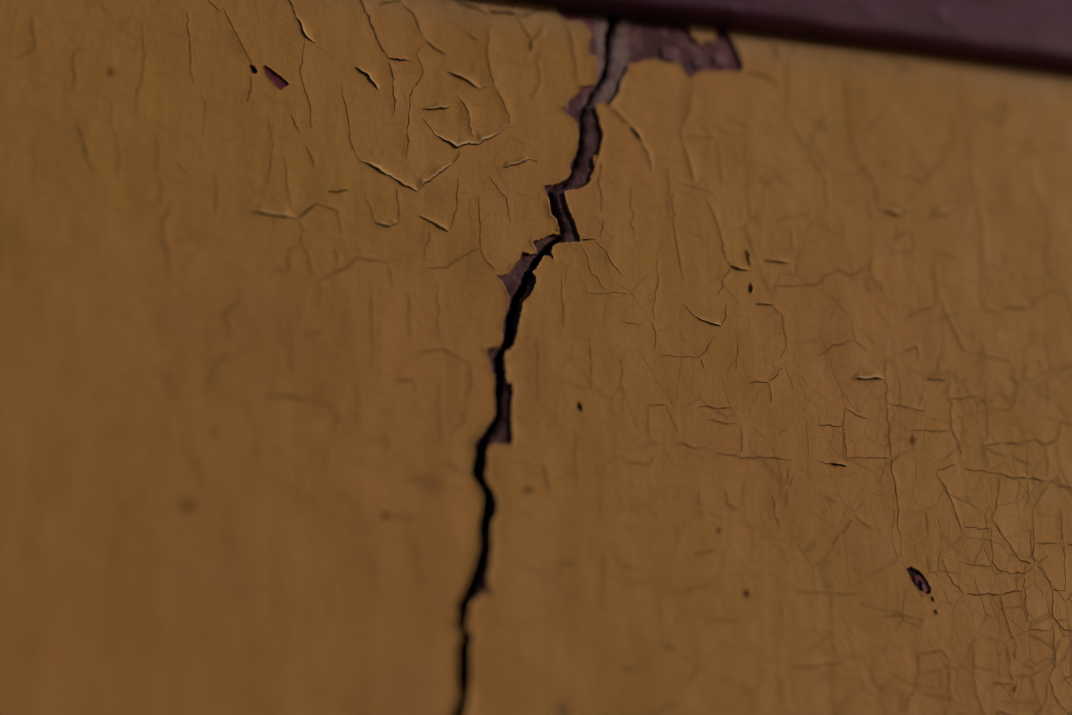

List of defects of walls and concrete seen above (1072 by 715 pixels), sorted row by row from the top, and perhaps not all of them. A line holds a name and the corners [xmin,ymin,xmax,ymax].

peeling [248,63,293,93]
crack [280,0,318,134]
crack [352,0,410,116]
crack [450,0,555,52]
peeling [626,17,748,78]
crack [748,31,786,65]
crack [818,42,934,80]
crack [668,192,756,296]
crack [442,13,659,715]
crack [818,361,950,558]
peeling [905,564,941,617]
crack [938,507,1072,646]